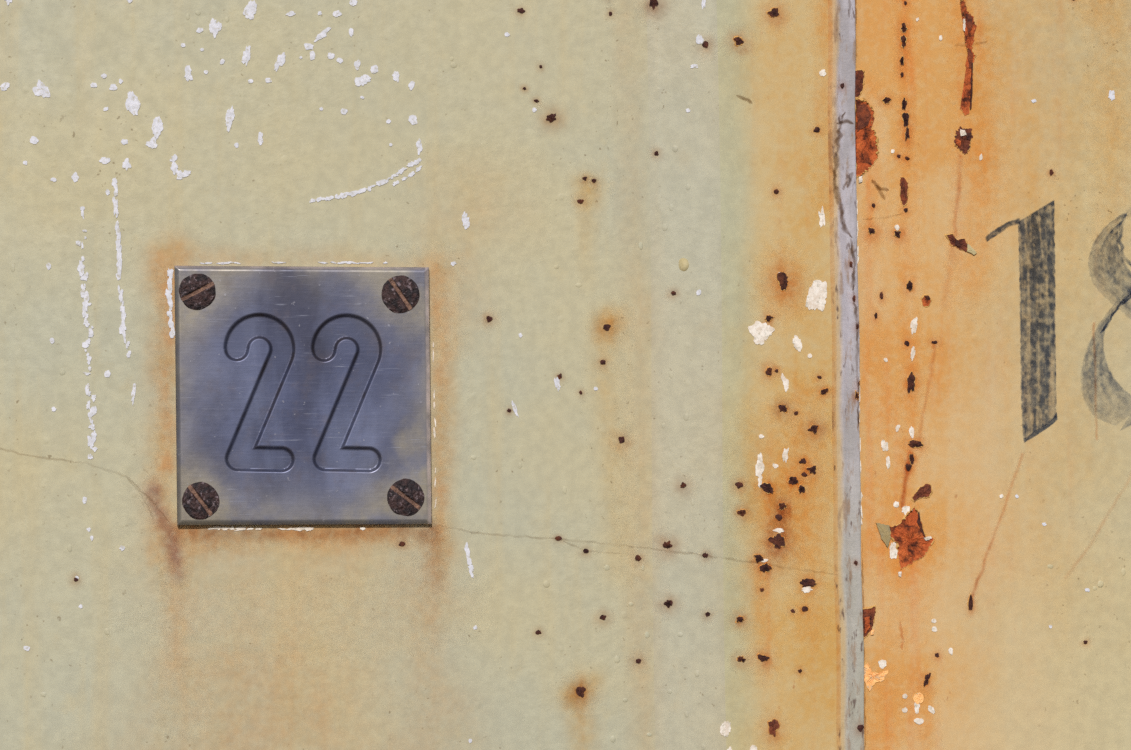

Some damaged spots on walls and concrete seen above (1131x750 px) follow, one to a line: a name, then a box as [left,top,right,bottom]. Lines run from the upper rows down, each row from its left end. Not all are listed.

peeling [241,46,286,83]
peeling [300,0,378,99]
peeling [90,73,140,115]
peeling [146,116,163,149]
peeling [170,154,191,180]
peeling [99,139,131,358]
peeling [165,268,175,338]
peeling [76,206,111,459]
peeling [861,483,935,577]
peeling [863,605,876,639]
peeling [864,660,889,692]
peeling [902,672,935,725]